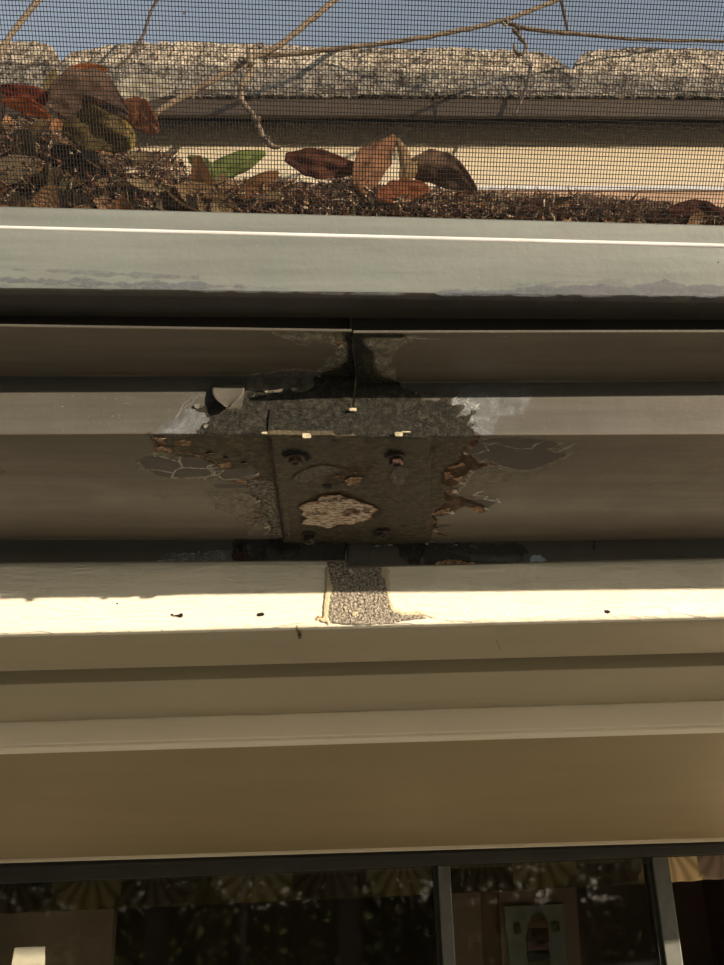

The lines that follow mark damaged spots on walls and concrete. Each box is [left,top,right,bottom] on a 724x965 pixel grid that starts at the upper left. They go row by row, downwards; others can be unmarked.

peeling [193,332,565,471]
peeling [136,450,258,489]
corrosion [146,433,285,540]
peeling [280,449,379,528]
corrosion [328,472,383,519]
corrosion [430,434,493,537]